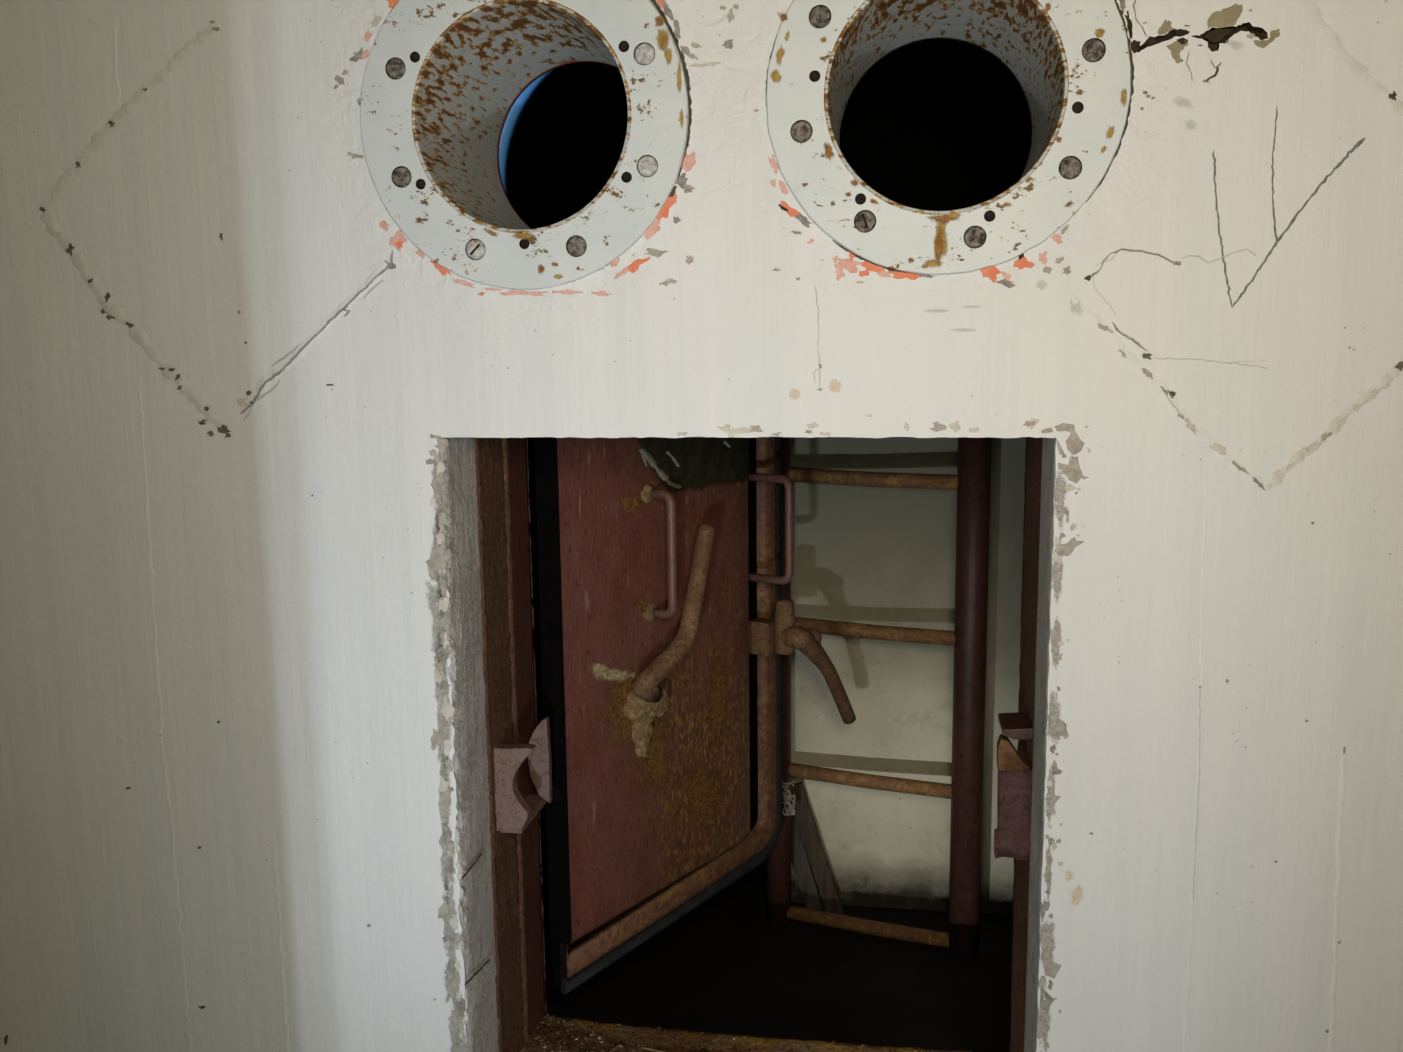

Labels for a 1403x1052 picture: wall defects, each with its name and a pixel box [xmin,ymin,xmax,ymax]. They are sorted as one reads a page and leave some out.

corrosion [655,16,681,90]
corrosion [771,14,789,82]
spalling [1119,0,1280,83]
crack [1086,0,1134,202]
corrosion [456,229,532,243]
peeling [379,132,696,296]
corrosion [908,213,960,268]
crack [1084,248,1257,316]
crack [236,251,396,420]
crack [1153,358,1266,369]
spalling [1024,419,1091,599]
spalling [426,434,466,1052]